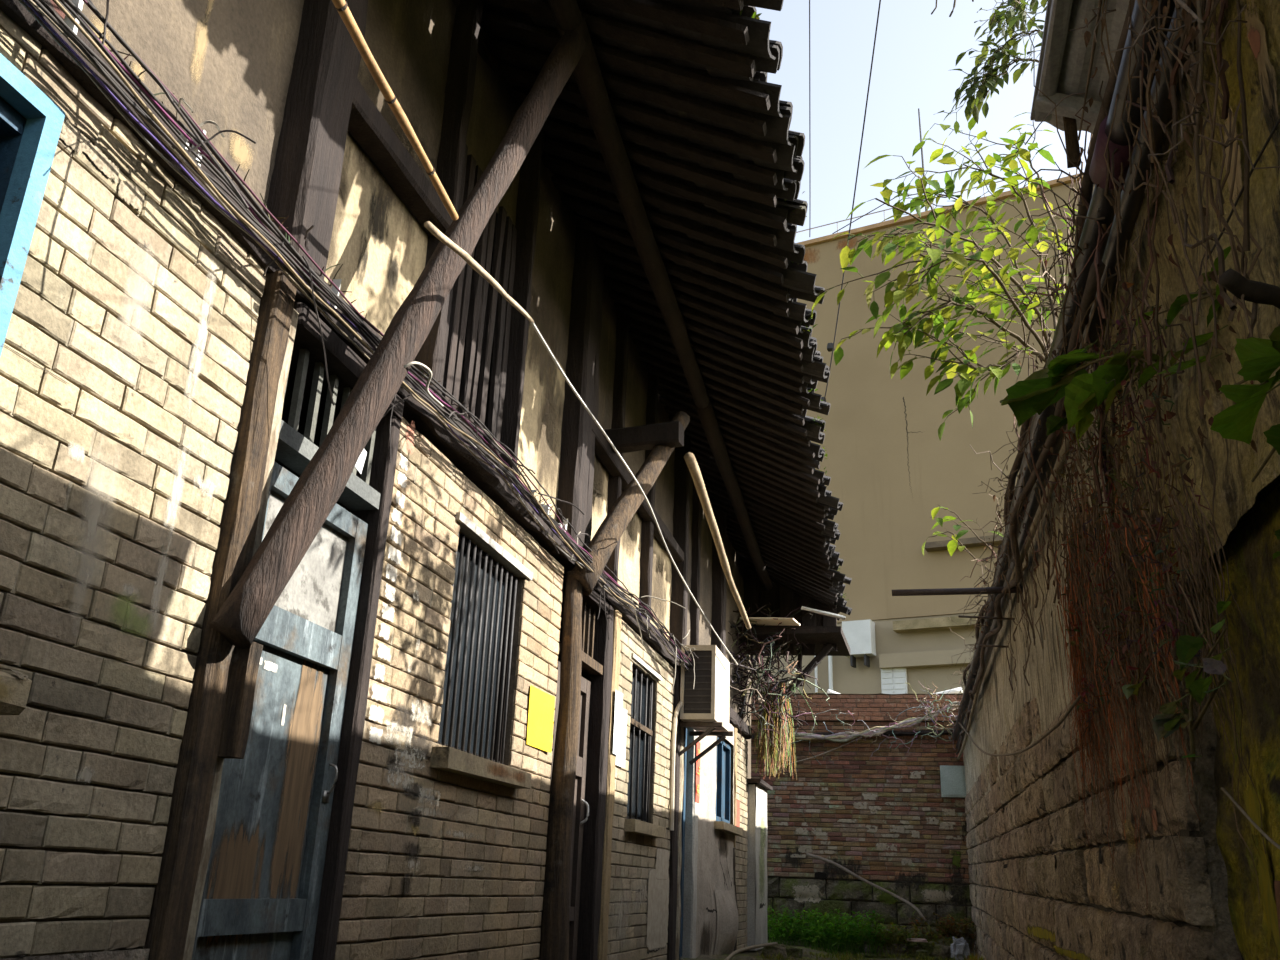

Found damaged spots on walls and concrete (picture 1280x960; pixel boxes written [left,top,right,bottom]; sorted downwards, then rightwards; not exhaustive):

leakage [357,189,388,283]
leakage [388,255,399,297]
peeling [369,421,440,804]
peeling [206,660,324,899]